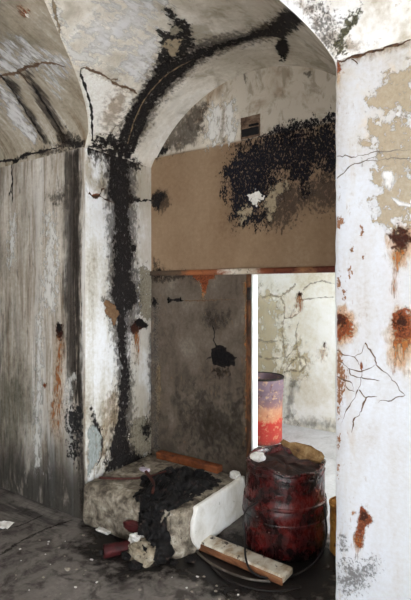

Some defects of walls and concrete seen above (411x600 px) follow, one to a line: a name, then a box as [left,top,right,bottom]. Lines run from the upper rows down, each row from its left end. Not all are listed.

leakage [304,0,363,58]
crack [80,66,137,139]
peeling [359,58,411,234]
rust [388,223,411,272]
spalling [104,299,120,327]
leakage [258,290,309,388]
crack [258,280,333,373]
rust [337,309,353,342]
rust [392,307,411,372]
leakage [62,372,103,468]
crack [337,342,405,433]
rust [352,506,373,557]